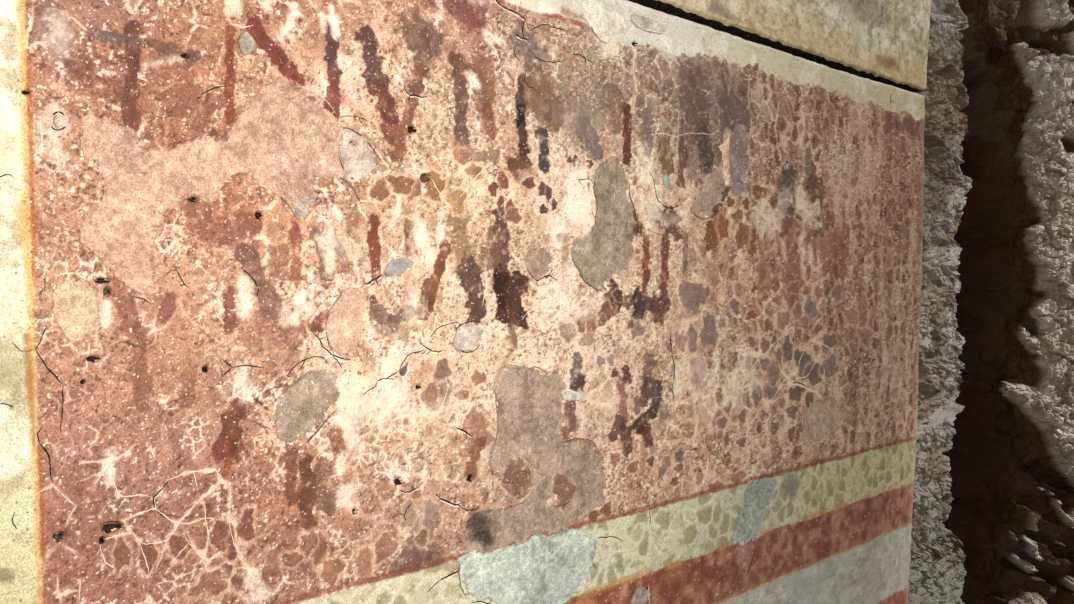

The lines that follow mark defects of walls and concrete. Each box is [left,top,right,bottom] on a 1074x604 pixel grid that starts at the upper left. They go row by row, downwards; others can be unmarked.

crack [494,0,592,89]
crack [652,109,719,169]
crack [748,77,804,181]
flaking render [51,76,377,343]
flaking render [571,159,638,291]
crack [13,325,76,525]
crack [84,447,248,573]
flaking render [273,370,340,443]
flaking render [457,363,606,604]
flaking render [732,477,778,577]